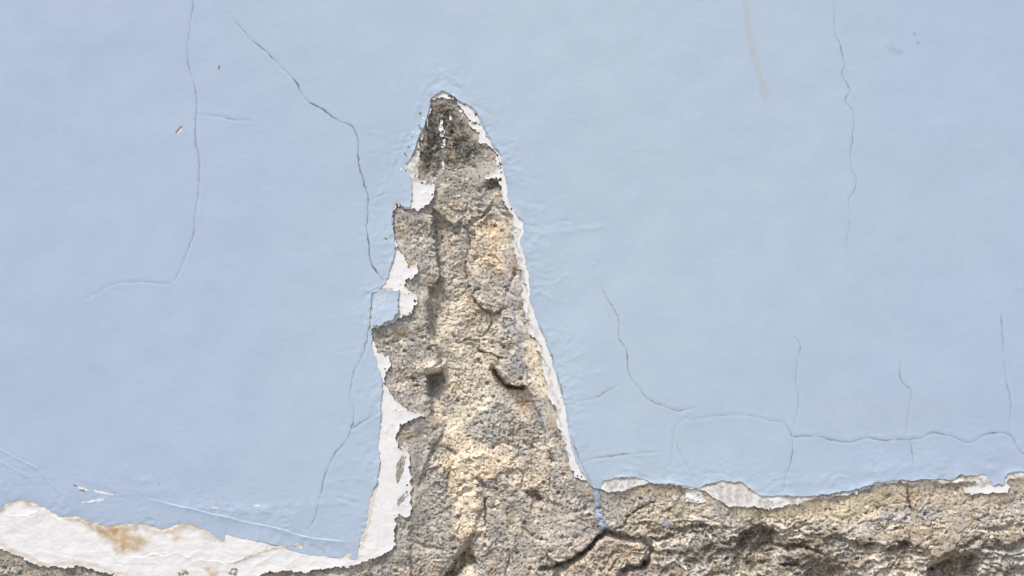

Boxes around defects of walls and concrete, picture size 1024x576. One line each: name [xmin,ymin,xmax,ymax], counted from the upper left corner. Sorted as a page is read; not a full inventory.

peeling [0,500,397,576]
spalling [260,91,1024,576]